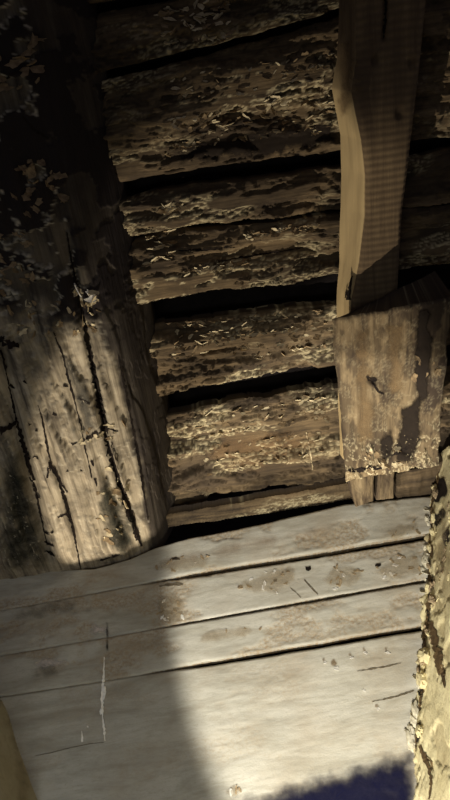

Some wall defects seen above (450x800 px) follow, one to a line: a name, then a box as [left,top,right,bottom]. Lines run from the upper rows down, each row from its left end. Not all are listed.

crack [0,232,149,569]
water stain [380,310,433,463]